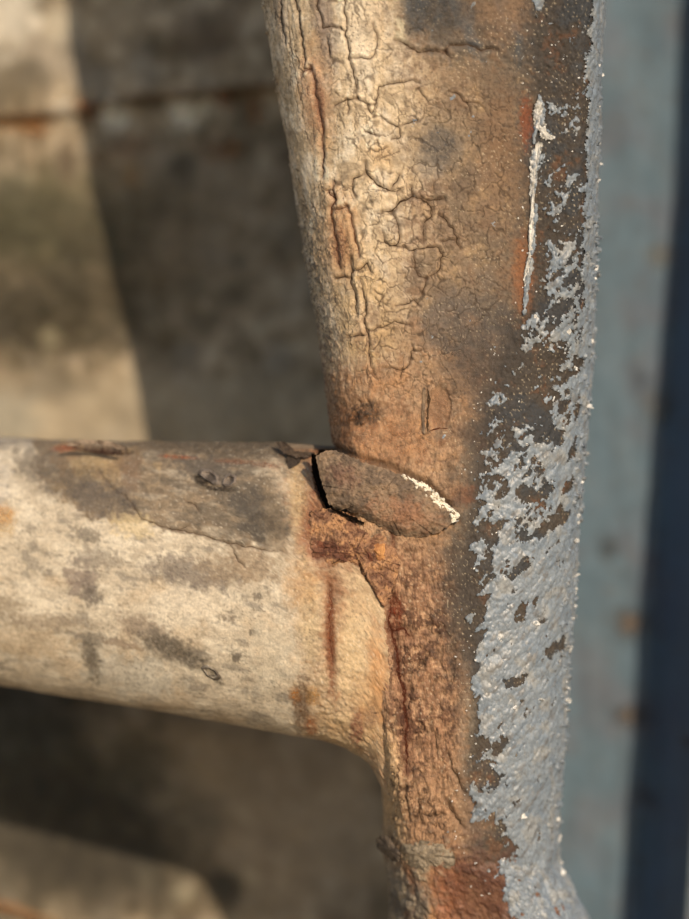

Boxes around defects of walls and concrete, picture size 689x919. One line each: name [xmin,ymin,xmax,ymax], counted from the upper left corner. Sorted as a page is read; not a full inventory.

crack [281,0,492,374]
crack [112,487,279,566]
crack [311,453,364,524]
corrosion [367,543,385,561]